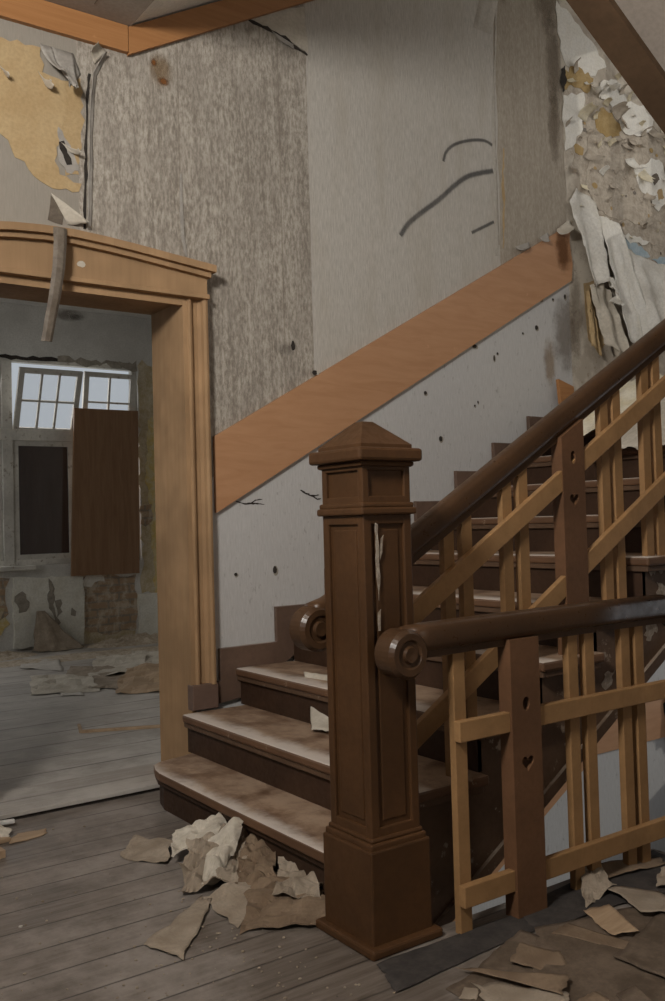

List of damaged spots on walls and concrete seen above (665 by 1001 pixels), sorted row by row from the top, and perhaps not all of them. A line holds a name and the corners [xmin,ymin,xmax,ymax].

peeling [555,0,665,264]
spalling [0,578,30,635]
spalling [47,360,157,644]